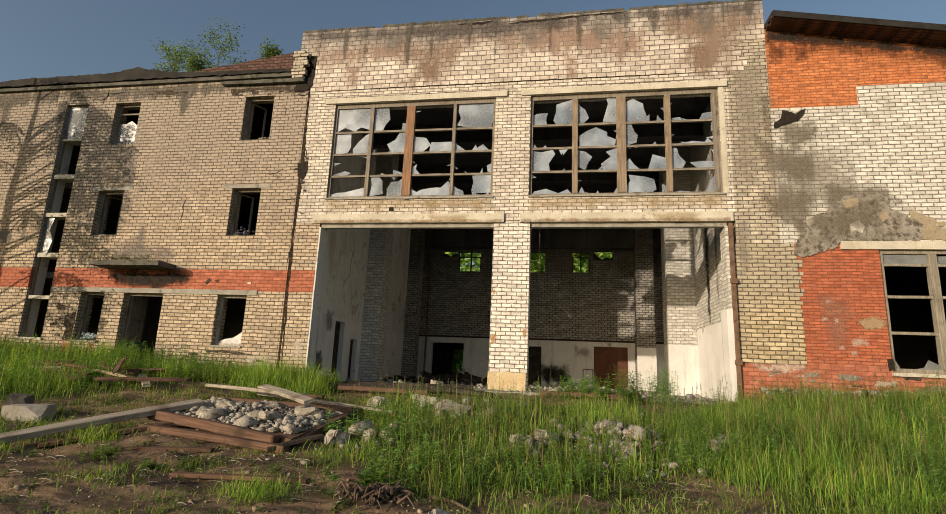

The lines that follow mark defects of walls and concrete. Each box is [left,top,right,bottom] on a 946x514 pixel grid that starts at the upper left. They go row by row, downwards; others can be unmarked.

leakage [319,13,640,86]
leakage [638,2,756,68]
leakage [0,83,304,130]
leakage [761,125,816,180]
leakage [767,190,813,237]
leakage [828,186,886,204]
flaking render [794,192,946,258]
spalling [50,303,76,340]